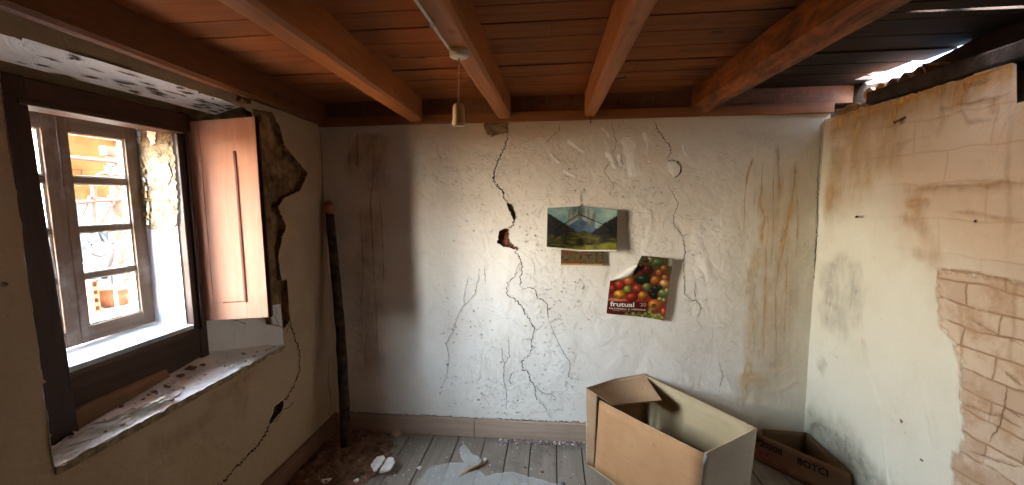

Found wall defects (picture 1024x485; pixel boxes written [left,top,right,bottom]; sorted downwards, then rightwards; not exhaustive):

flaking render [15,54,308,329]
crack [492,134,515,228]
flaking render [489,202,544,252]
crack [654,120,707,332]
crack [218,311,301,485]
crack [328,253,586,423]
flaking render [935,270,1024,485]